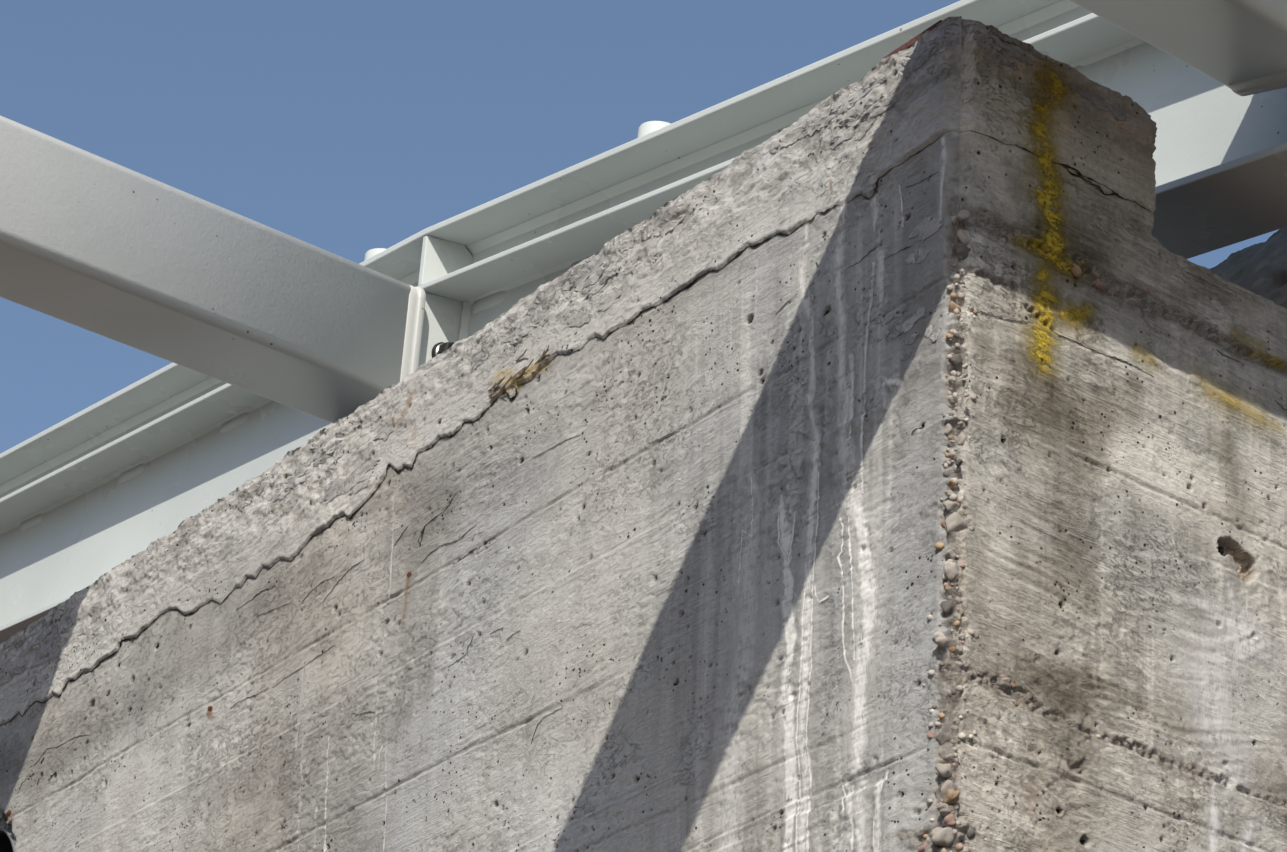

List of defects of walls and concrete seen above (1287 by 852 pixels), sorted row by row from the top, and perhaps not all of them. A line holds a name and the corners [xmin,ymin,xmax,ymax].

crack [1,130,1153,725]
leakage [719,472,760,852]
leakage [776,197,901,852]
spalling [895,210,1287,852]